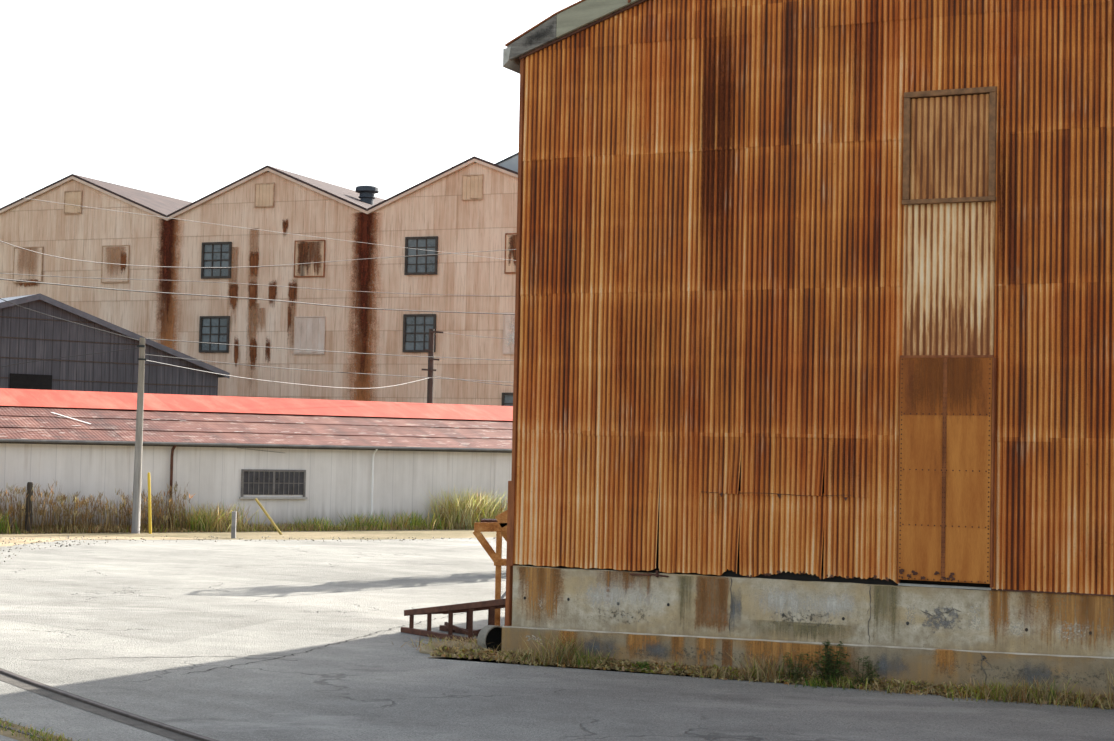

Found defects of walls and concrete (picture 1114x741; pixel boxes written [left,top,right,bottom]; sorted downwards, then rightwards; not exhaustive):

rust [702,54,731,231]
rust [160,219,179,350]
rust [228,228,321,369]
rust [352,212,377,401]
rust [509,235,517,263]
rust [1000,167,1015,251]
rust [628,576,733,667]
rust [748,640,851,671]
rust [989,590,1009,637]